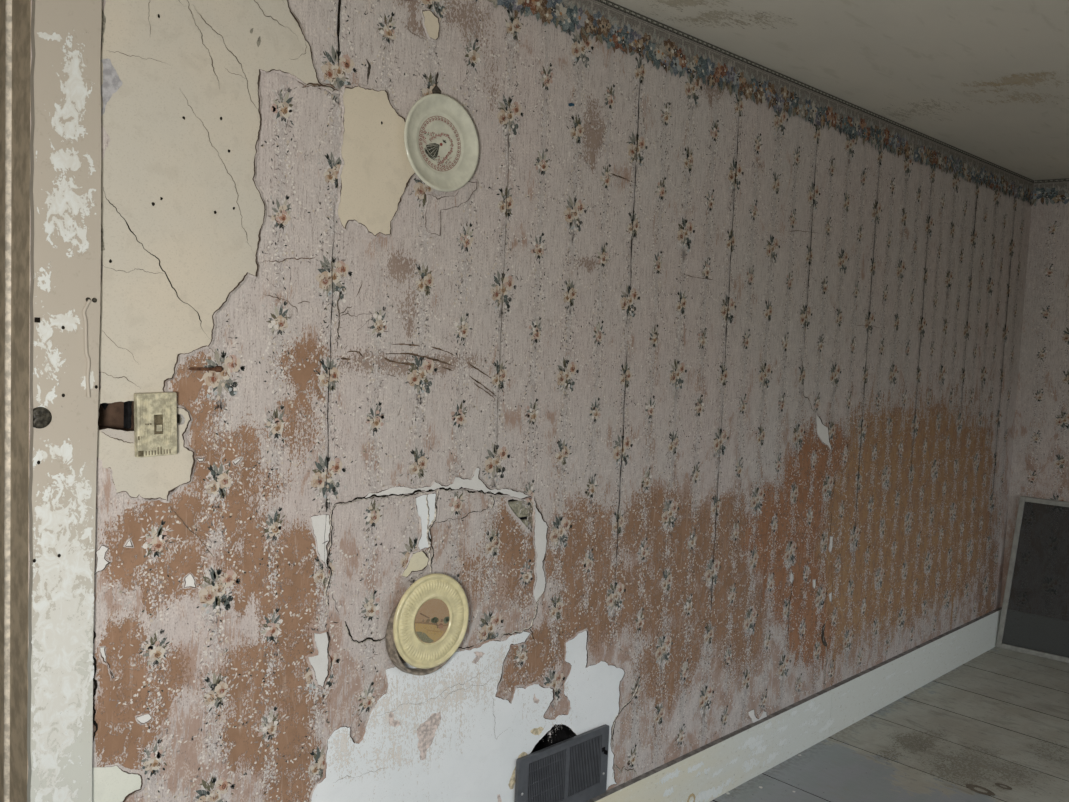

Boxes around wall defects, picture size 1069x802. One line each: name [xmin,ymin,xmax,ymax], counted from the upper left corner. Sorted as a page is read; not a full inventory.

crack [179,0,256,107]
crack [254,0,338,91]
peeling [37,30,97,258]
crack [180,90,315,263]
peeling [33,263,83,408]
peeling [80,371,95,392]
spalling [98,401,134,443]
crack [103,187,213,351]
peeling [31,438,95,802]
water stain [93,245,492,802]
water stain [443,473,774,737]
water stain [789,373,1008,685]